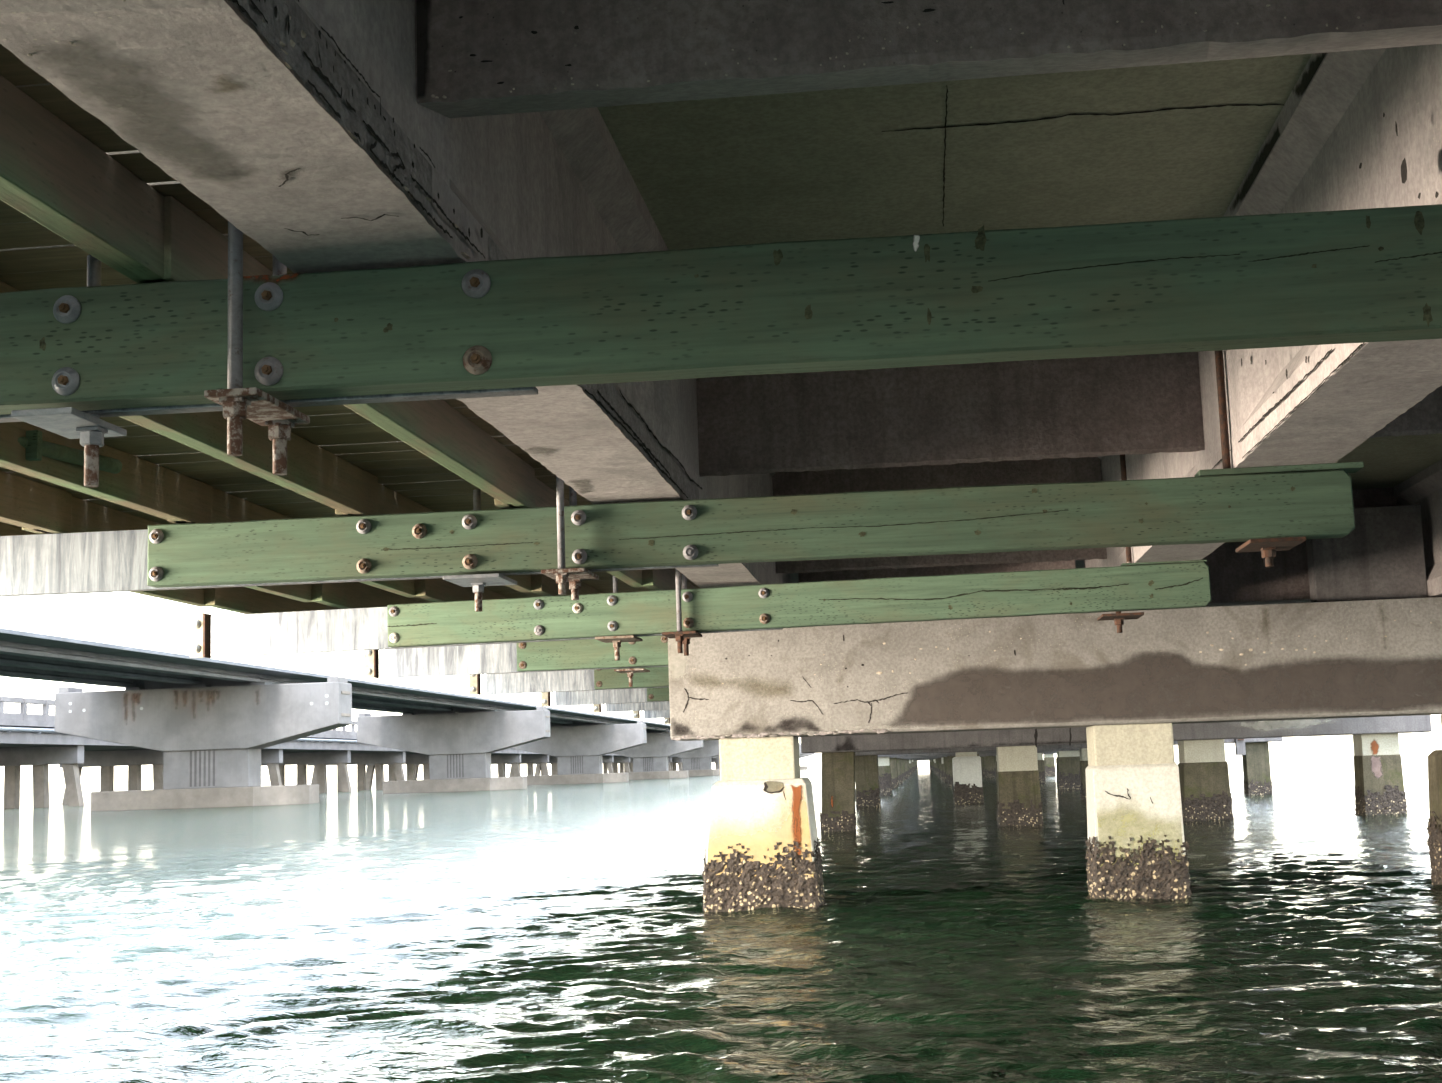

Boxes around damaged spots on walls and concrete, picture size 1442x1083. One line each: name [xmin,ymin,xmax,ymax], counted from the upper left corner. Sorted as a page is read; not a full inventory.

spalling [230,0,439,226]
crack [882,85,1284,226]
spalling [581,383,699,500]
crack [683,688,709,713]
crack [790,676,907,723]
leakage [893,653,1442,747]
rust [792,785,802,855]